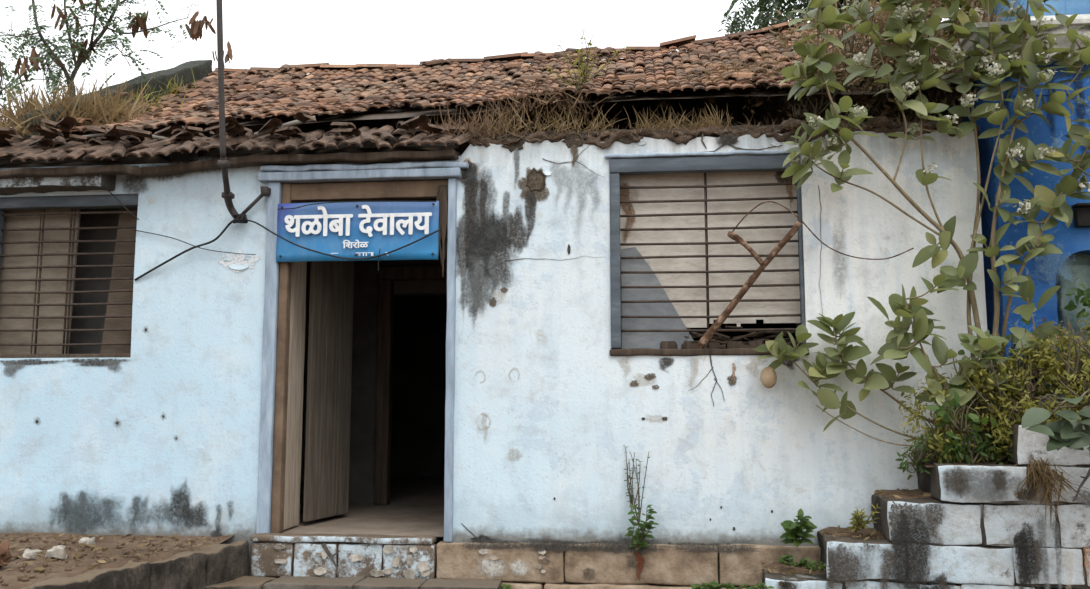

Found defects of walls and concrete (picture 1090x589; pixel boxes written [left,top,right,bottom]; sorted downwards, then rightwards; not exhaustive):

flaking render [501,134,552,243]
damp [445,163,526,316]
damp [0,358,127,376]
damp [59,484,232,537]
damp [827,501,954,589]
damp [943,468,1022,500]
damp [1013,516,1061,589]